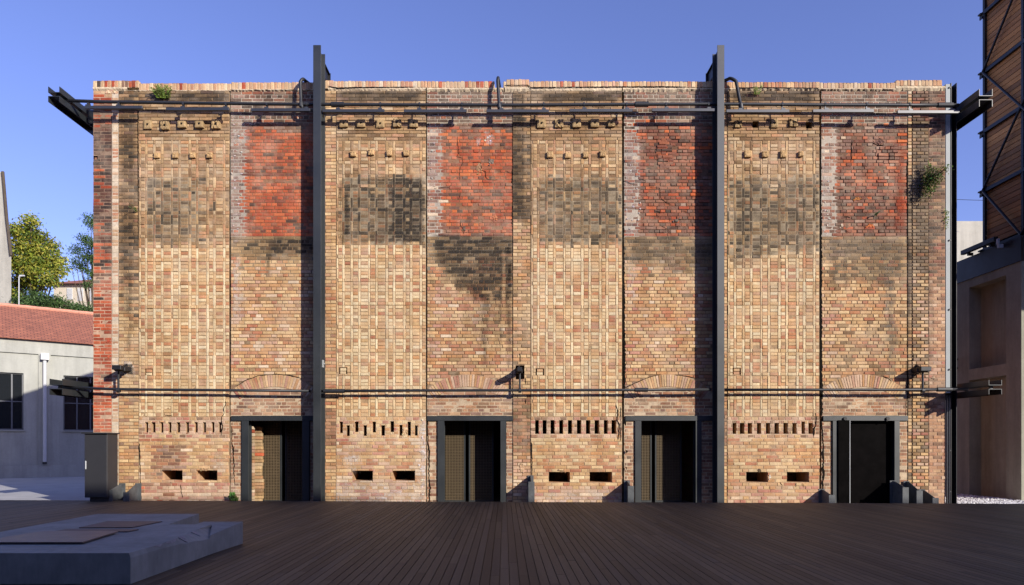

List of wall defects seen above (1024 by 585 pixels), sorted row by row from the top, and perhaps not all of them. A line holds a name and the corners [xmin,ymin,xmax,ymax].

crack [221,165,300,482]
crack [426,138,513,389]
crack [616,154,693,470]